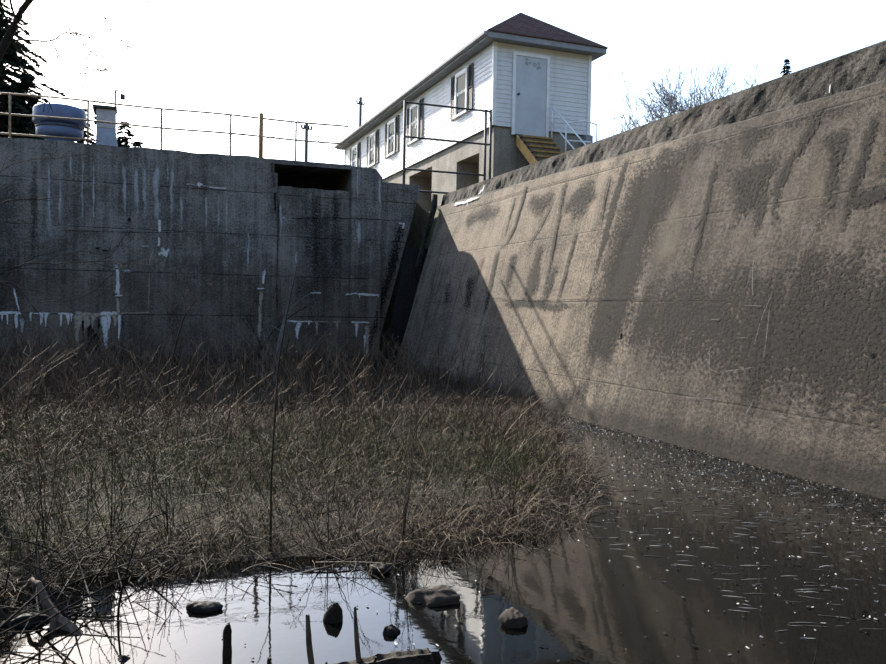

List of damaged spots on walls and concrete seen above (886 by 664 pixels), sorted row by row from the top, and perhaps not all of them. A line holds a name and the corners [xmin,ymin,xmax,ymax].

efflorescence [44,166,62,246]
efflorescence [0,265,150,360]
efflorescence [69,155,95,227]
efflorescence [122,162,183,292]
efflorescence [186,182,236,241]
damp [289,222,405,365]
damp [455,94,886,434]